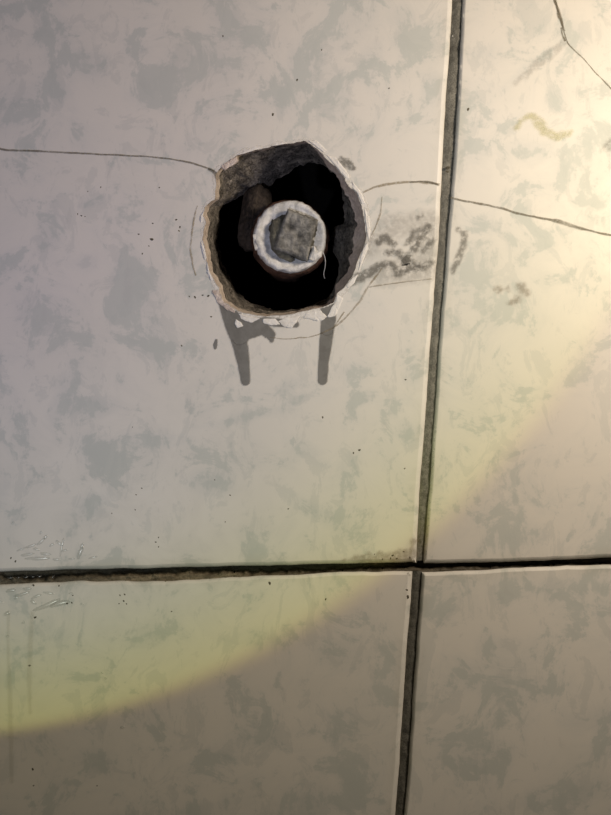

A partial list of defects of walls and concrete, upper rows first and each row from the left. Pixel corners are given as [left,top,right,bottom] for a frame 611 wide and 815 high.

crack [554,0,611,89]
crack [0,148,218,180]
spalling [200,139,373,328]
crack [365,181,611,236]
water stain [219,304,299,385]
water stain [318,304,336,385]